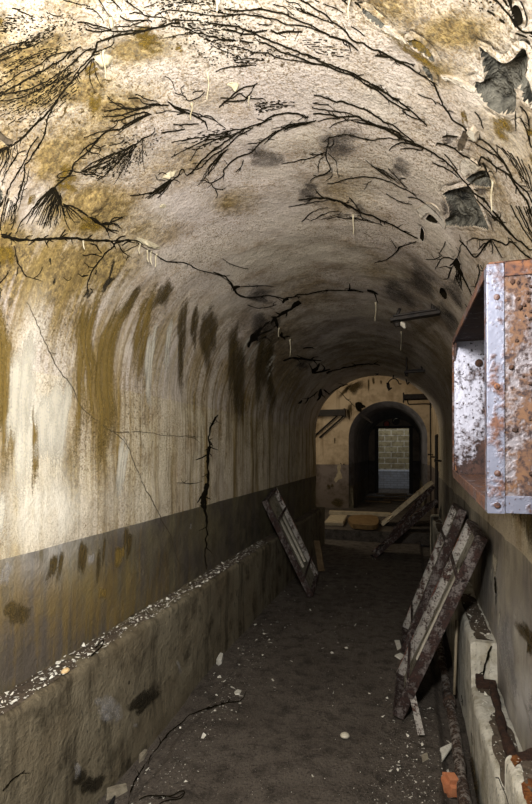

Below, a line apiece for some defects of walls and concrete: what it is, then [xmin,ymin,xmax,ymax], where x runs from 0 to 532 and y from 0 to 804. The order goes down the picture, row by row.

water stain [0,9,114,122]
spalling [357,0,532,121]
spalling [0,180,10,228]
crack [0,0,532,406]
spalling [416,125,497,242]
water stain [0,261,174,496]
water stain [164,301,218,387]
water stain [228,317,276,423]
crack [27,303,222,571]
water stain [514,514,532,544]
water stain [515,621,532,654]
crack [128,692,246,804]